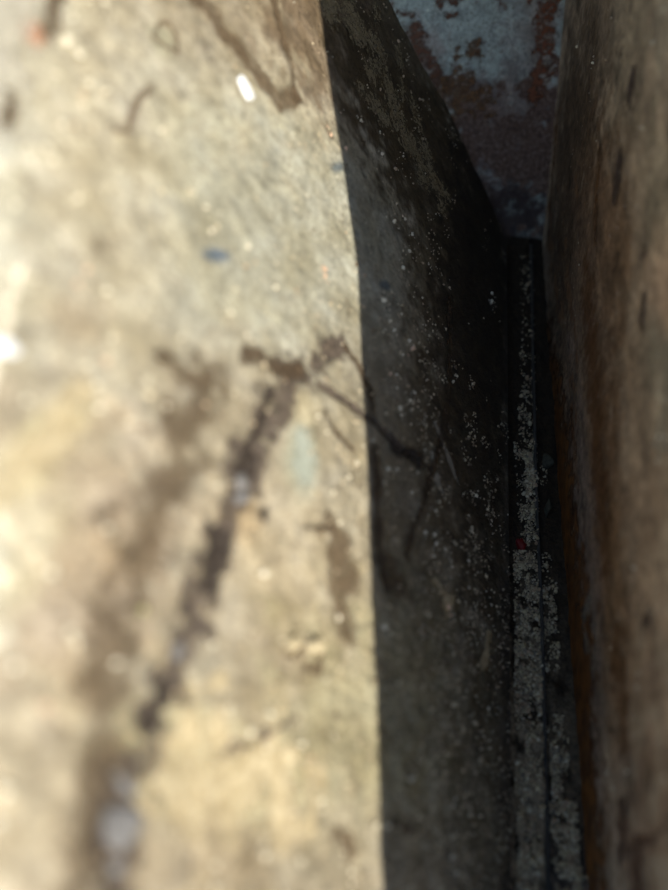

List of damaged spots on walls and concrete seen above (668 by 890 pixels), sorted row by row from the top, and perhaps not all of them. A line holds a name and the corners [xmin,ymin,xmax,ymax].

rust [396,10,497,123]
rust [435,0,463,20]
rust [526,0,561,105]
crack [83,293,454,890]